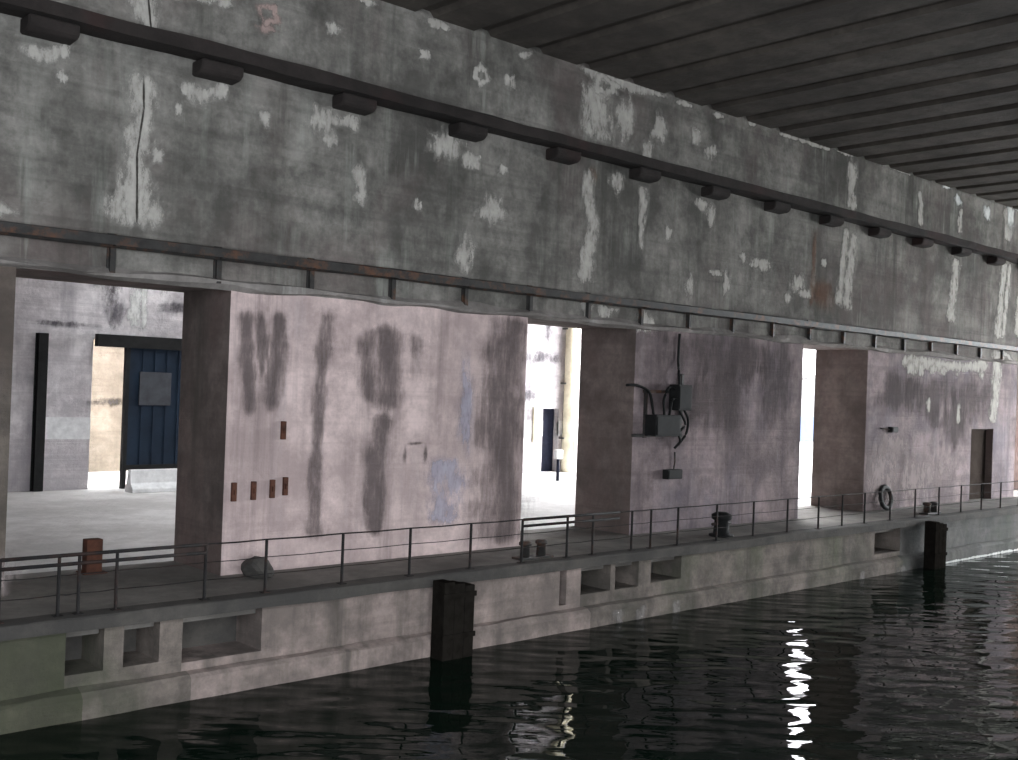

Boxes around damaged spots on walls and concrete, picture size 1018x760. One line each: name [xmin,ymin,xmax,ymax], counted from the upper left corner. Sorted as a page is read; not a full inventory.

efflorescence [577,170,600,283]
efflorescence [608,172,623,193]
efflorescence [835,228,857,310]
efflorescence [838,151,858,211]
water stain [1003,208,1012,241]
water stain [241,313,287,412]
water stain [884,258,1018,447]
water stain [309,339,328,533]
water stain [362,327,398,534]